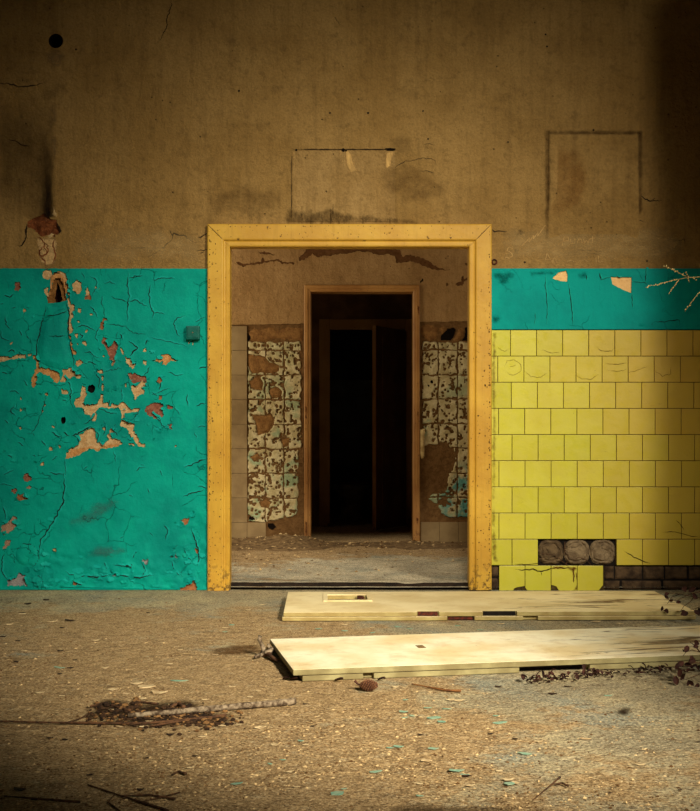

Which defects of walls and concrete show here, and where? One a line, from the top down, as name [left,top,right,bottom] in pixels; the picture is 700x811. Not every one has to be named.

flaking render [20,207,61,246]
peeling [236,249,444,270]
peeling [553,271,568,282]
crack [568,273,610,324]
peeling [611,276,631,293]
peeling [0,270,178,459]
crack [8,272,207,585]
peeling [1,516,17,551]
peeling [7,573,27,586]
crack [518,563,575,582]